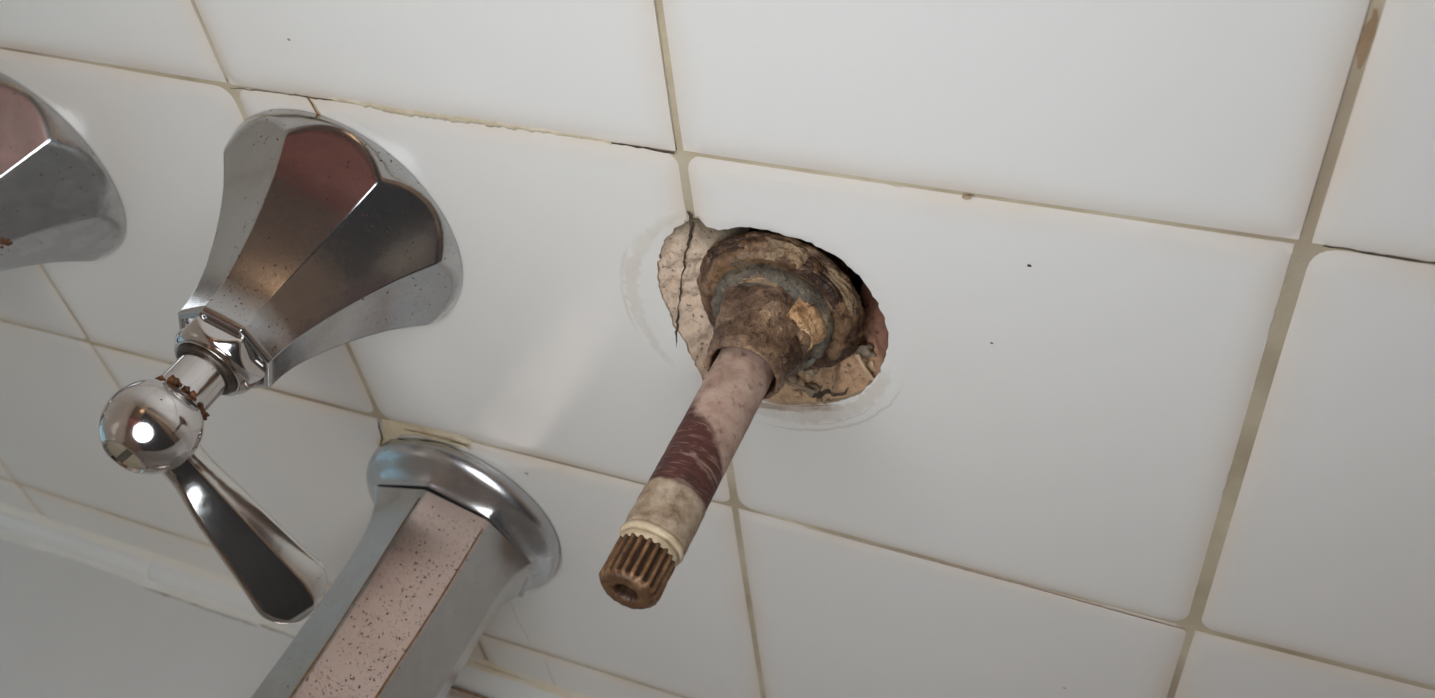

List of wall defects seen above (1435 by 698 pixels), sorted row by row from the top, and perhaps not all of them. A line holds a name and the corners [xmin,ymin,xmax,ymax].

spalling [658,217,889,404]